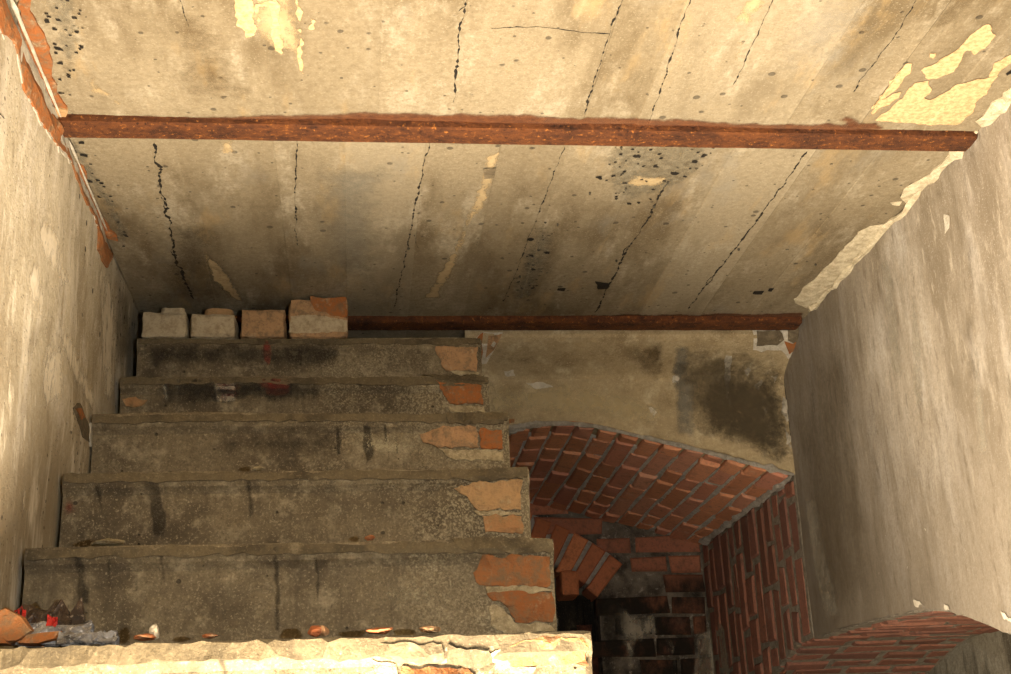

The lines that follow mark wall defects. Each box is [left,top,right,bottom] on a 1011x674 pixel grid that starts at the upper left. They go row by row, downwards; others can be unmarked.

spalling [0,0,128,268]
peeling [234,0,284,54]
crack [453,0,467,102]
rust [185,112,881,130]
crack [649,0,691,120]
peeling [871,24,1011,125]
crack [153,144,194,299]
crack [394,143,430,307]
crack [688,152,807,309]
damp [684,362,785,454]
flaking render [454,479,524,534]
flaking render [473,554,579,623]